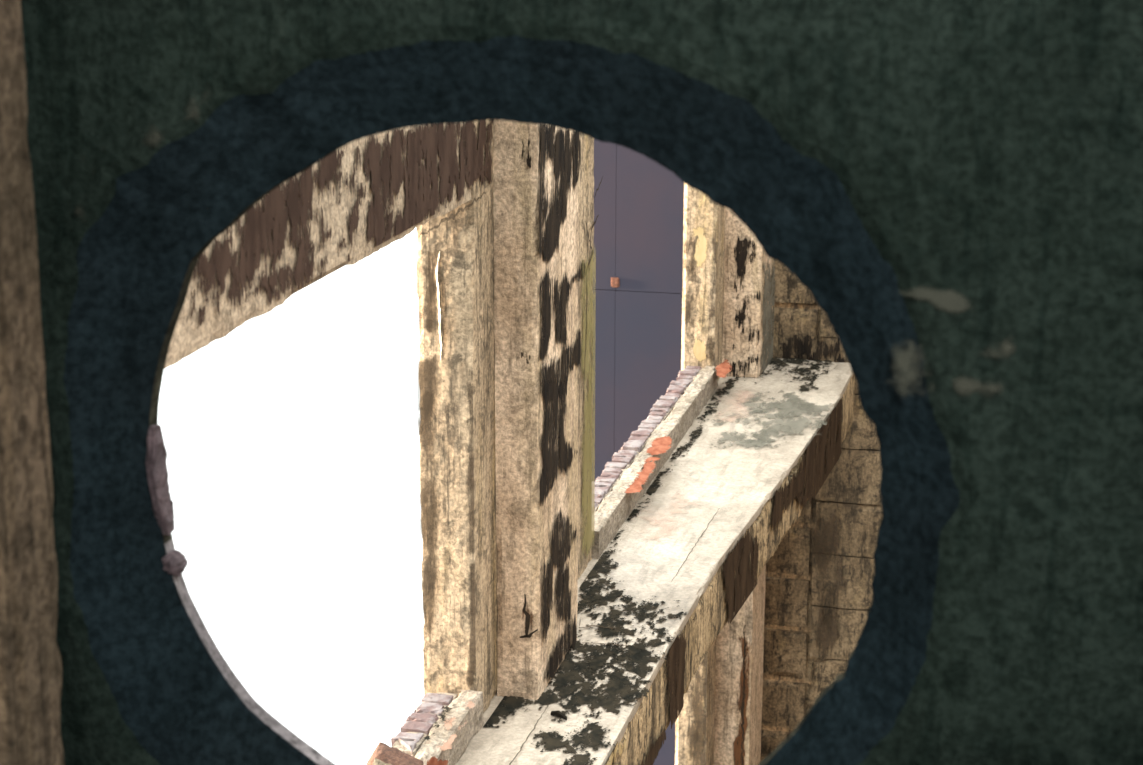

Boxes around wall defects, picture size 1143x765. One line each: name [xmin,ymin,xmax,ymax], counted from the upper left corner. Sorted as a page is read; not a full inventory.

damp [417,354,439,636]
damp [422,251,436,333]
damp [518,125,581,506]
damp [542,509,695,680]
damp [609,234,844,548]